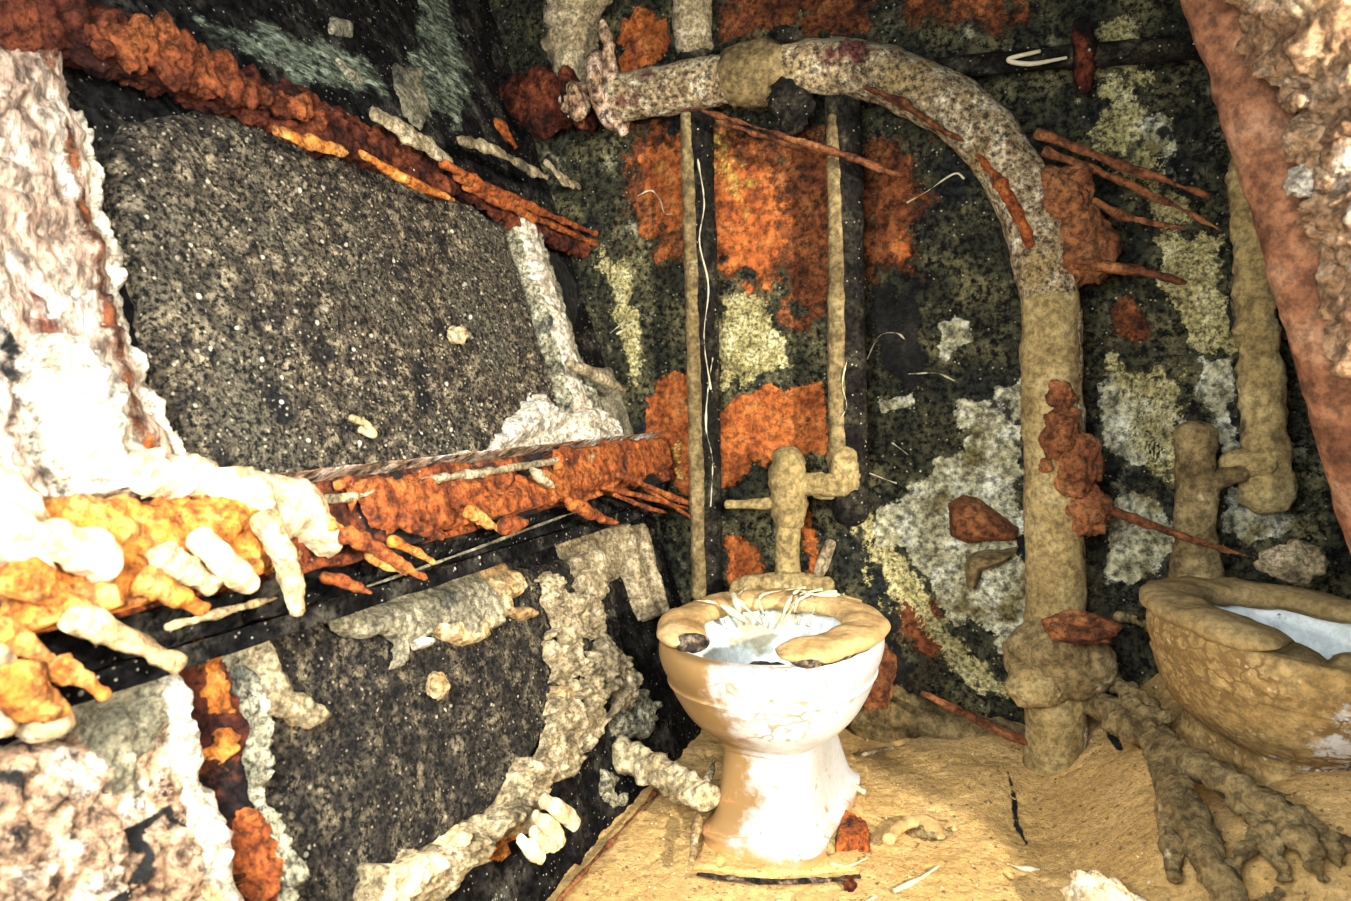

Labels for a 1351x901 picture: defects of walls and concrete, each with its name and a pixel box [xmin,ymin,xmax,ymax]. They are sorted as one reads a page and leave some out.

rust [62,116,161,449]
rust [358,149,455,202]
rust [616,118,683,270]
rust [701,109,940,332]
spalling [0,327,62,490]
rust [327,370,691,581]
rust [720,381,829,488]
rust [0,493,276,744]
rust [319,572,372,594]
peeling [63,679,170,798]
peeling [200,656,241,765]
rust [231,807,285,901]